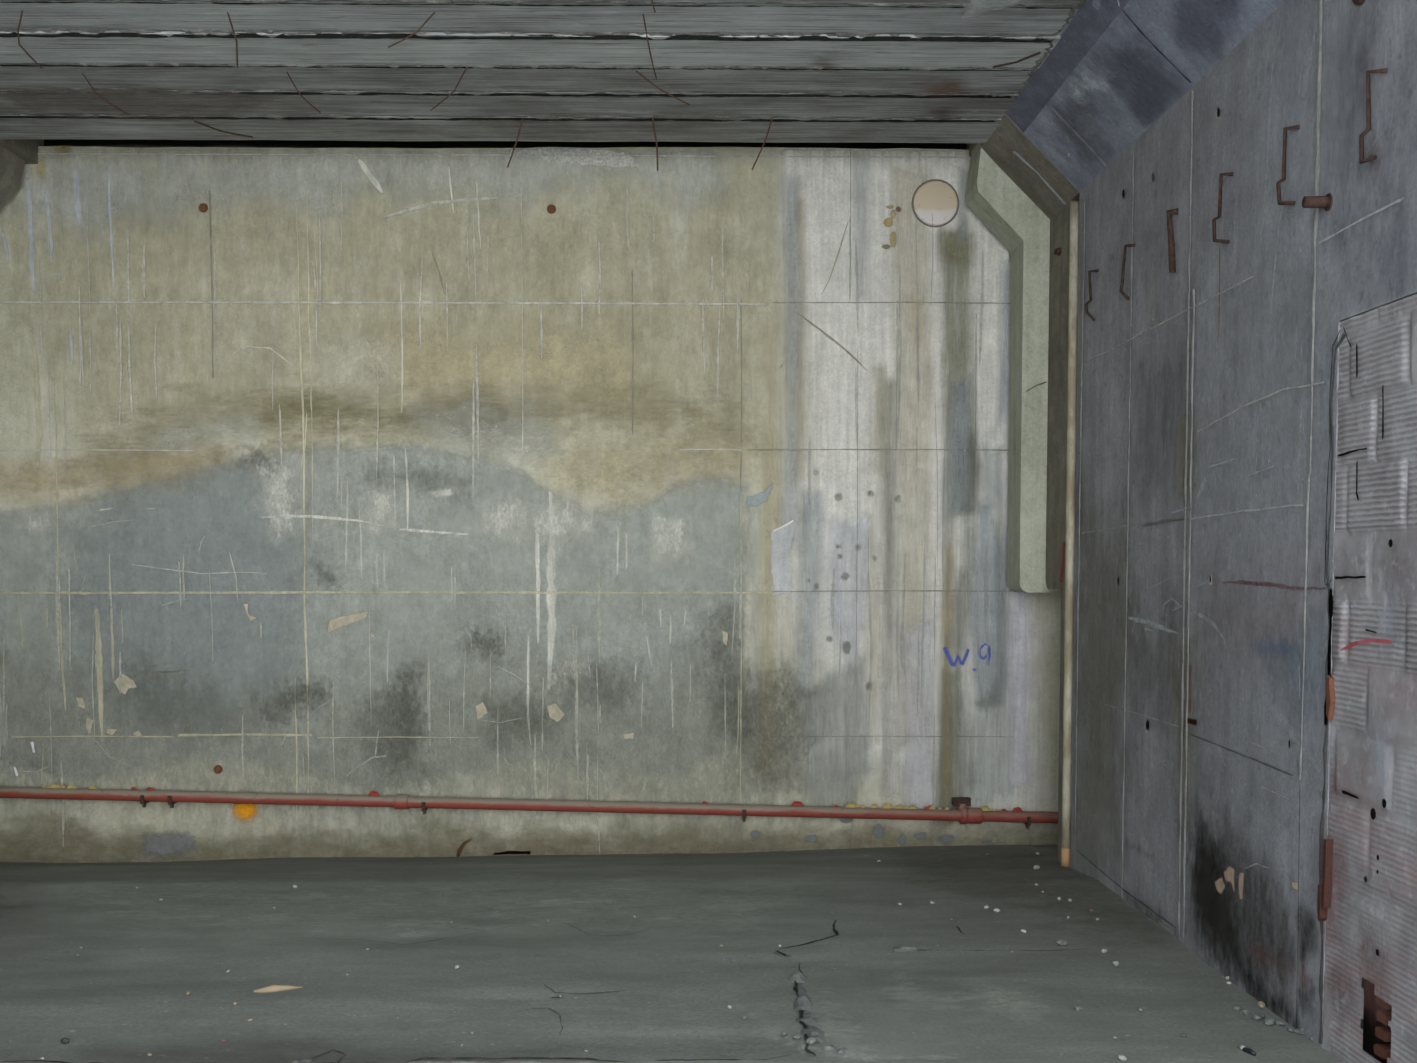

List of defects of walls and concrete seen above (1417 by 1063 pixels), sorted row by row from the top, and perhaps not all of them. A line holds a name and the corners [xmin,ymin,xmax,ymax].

water stain [0,150,1038,836]
crack [2,1055,99,1063]
crack [292,920,839,1063]
water stain [1194,825,1313,1029]
spalling [1374,996,1392,1059]